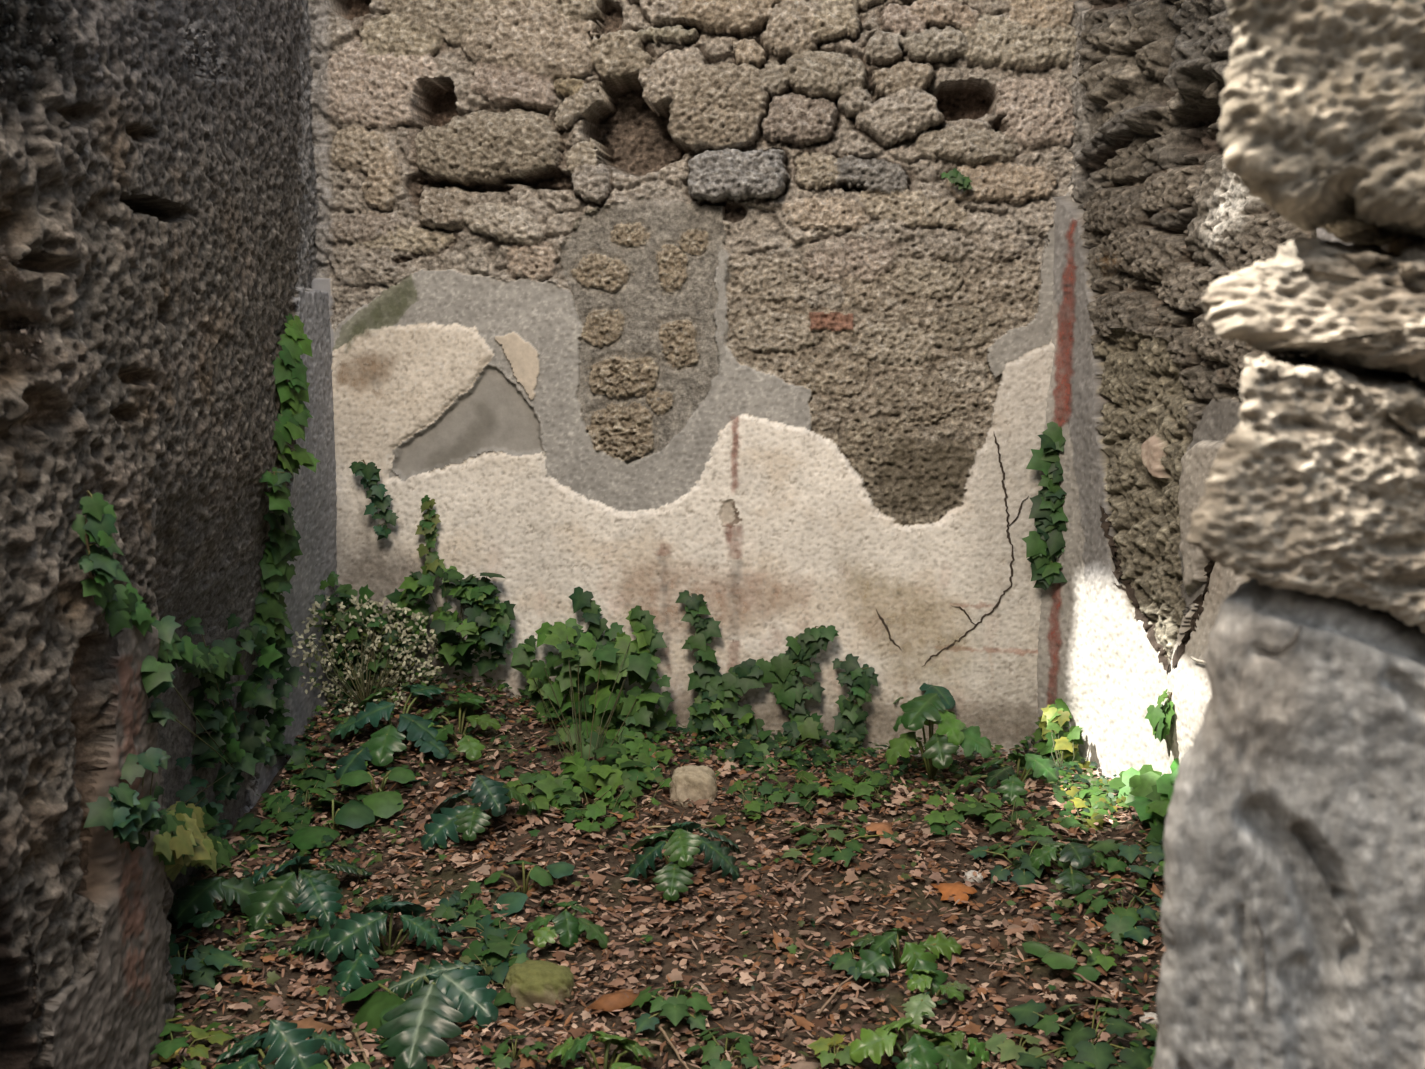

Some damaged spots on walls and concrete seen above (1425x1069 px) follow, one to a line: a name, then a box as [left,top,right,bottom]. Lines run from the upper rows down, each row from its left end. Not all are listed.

leakage [0,0,67,97]
rust [1053,220,1076,427]
flaking render [331,196,1055,757]
crack [876,434,1029,667]
rust [1048,583,1061,705]
spalling [1095,328,1225,660]